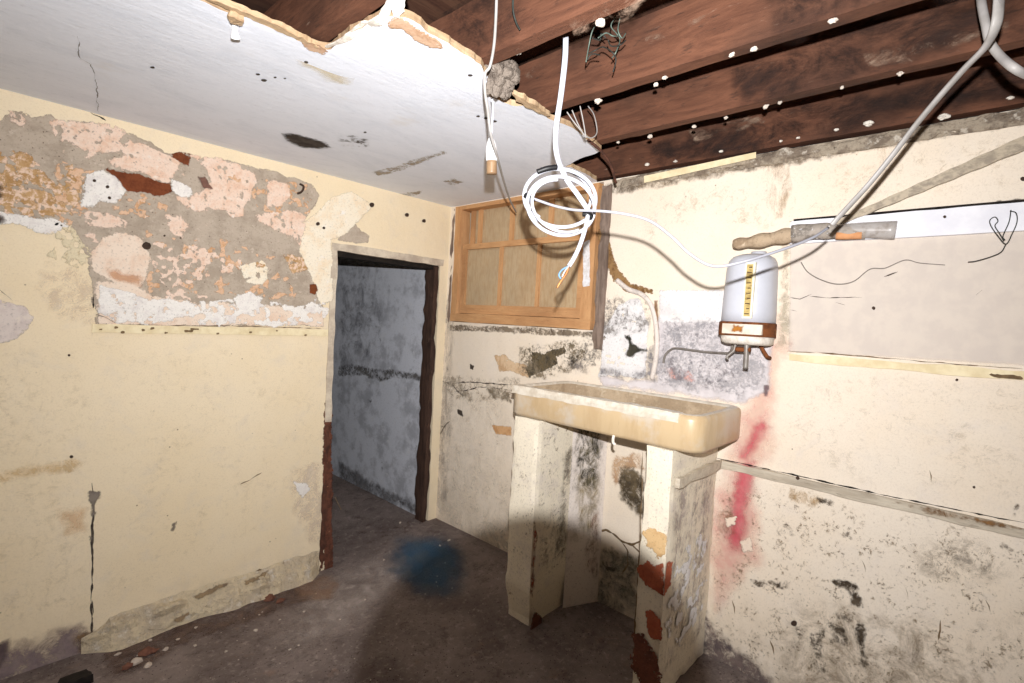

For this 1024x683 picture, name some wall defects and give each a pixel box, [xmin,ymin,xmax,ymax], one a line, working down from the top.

crack [77,36,105,120]
damp [285,134,329,149]
flaking render [0,110,323,324]
damp [520,301,769,396]
damp [534,429,600,529]
damp [619,468,645,518]
crack [88,486,96,633]
spalling [195,583,227,599]
damp [598,550,638,609]
spalling [630,528,707,683]
damp [672,488,997,683]